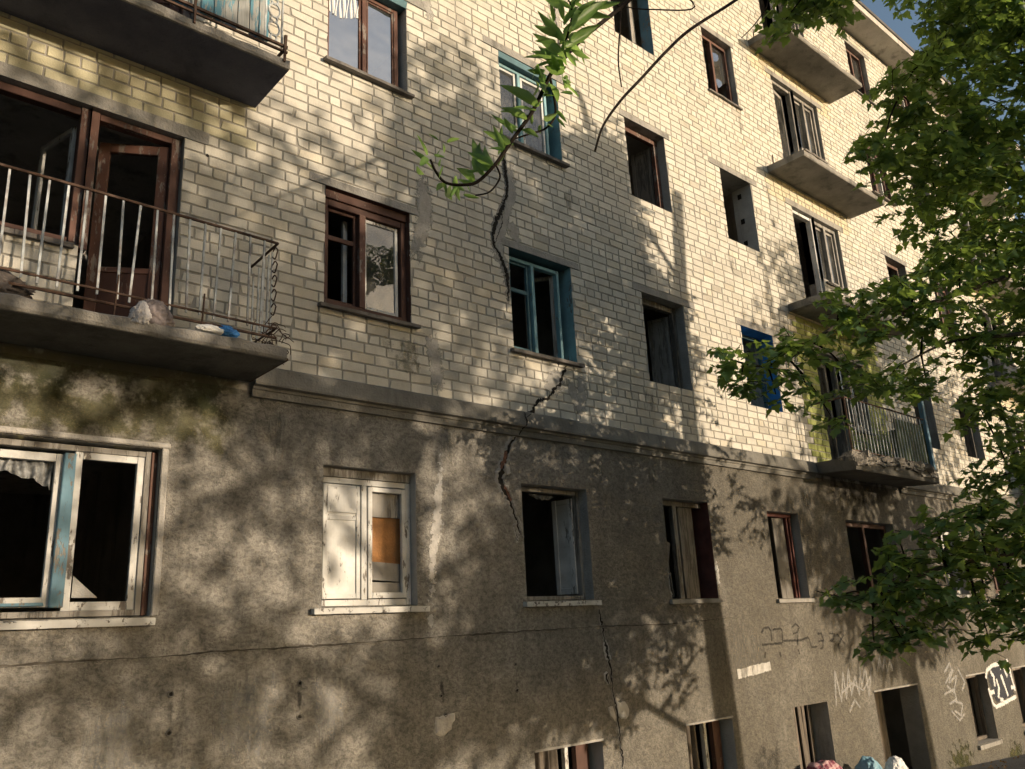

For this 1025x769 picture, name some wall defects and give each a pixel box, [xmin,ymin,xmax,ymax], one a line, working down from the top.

crack [490,153,521,301]
leakage [0,381,228,449]
crack [494,366,587,543]
crack [598,609,629,769]